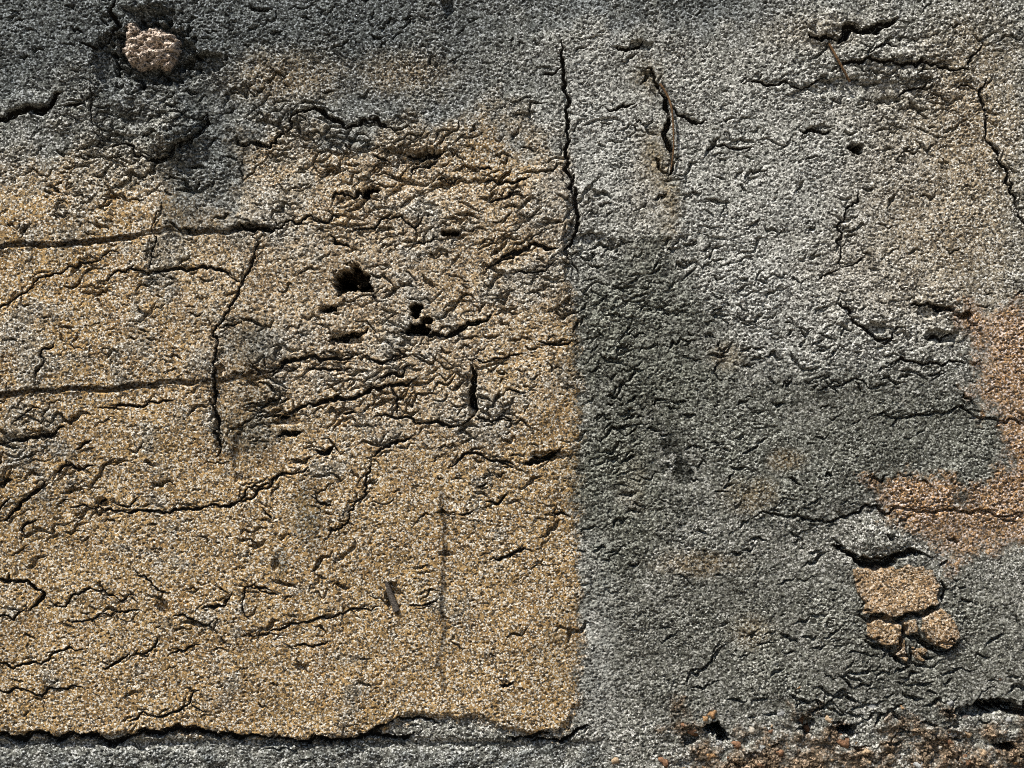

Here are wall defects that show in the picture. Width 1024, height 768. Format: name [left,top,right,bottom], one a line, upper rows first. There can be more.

crack [82,0,122,51]
crack [0,87,211,165]
crack [237,106,530,203]
crack [485,41,580,277]
crack [744,19,1024,224]
crack [0,185,437,457]
crack [0,343,94,536]
crack [72,293,575,542]
crack [0,570,439,748]
crack [493,547,530,561]
spalling [672,696,1024,768]
flaking render [853,564,961,667]